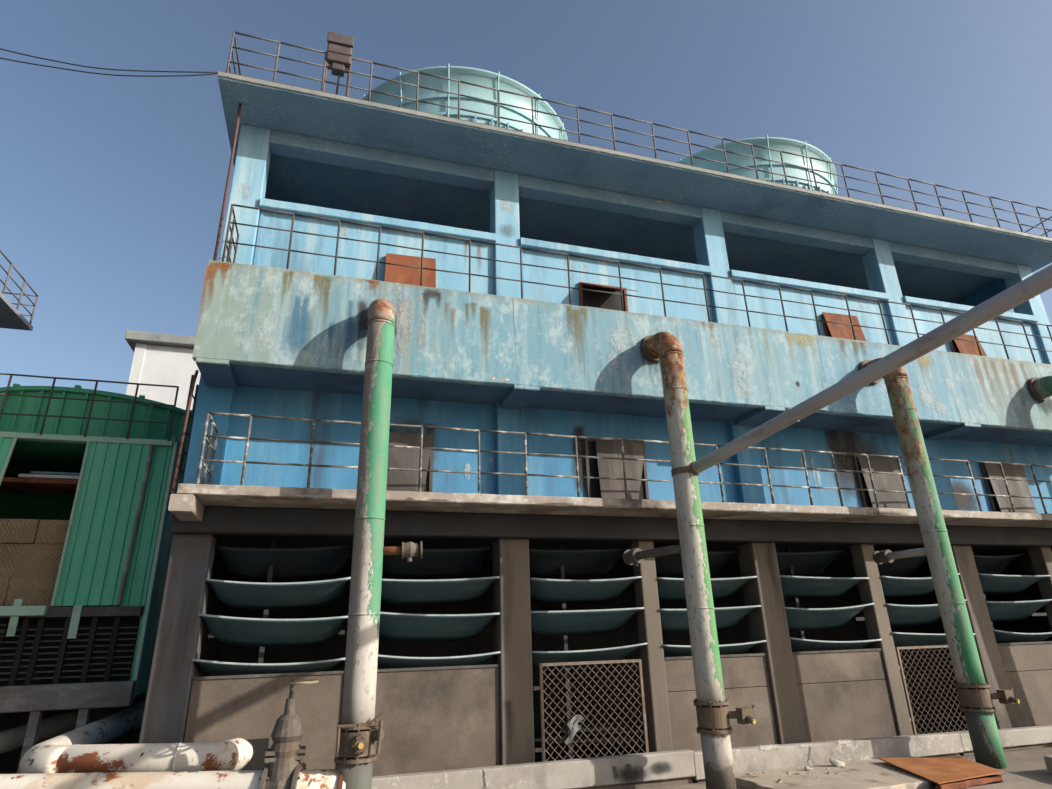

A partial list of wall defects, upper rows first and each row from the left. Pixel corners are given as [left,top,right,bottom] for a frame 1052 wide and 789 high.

corrosion [202,262,231,303]
damp [315,275,331,302]
damp [292,297,310,348]